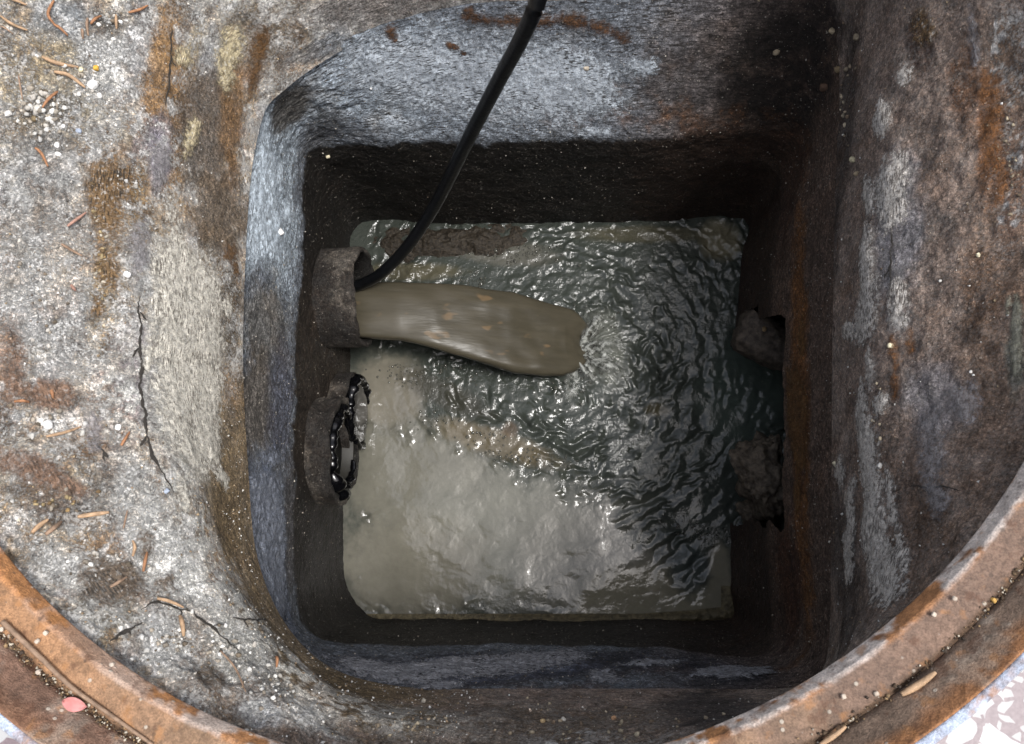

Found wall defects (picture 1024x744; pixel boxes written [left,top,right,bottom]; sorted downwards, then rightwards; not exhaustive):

corrosion [385,25,398,43]
corrosion [462,8,521,27]
corrosion [537,14,628,43]
crack [132,296,174,492]
crack [110,600,268,651]